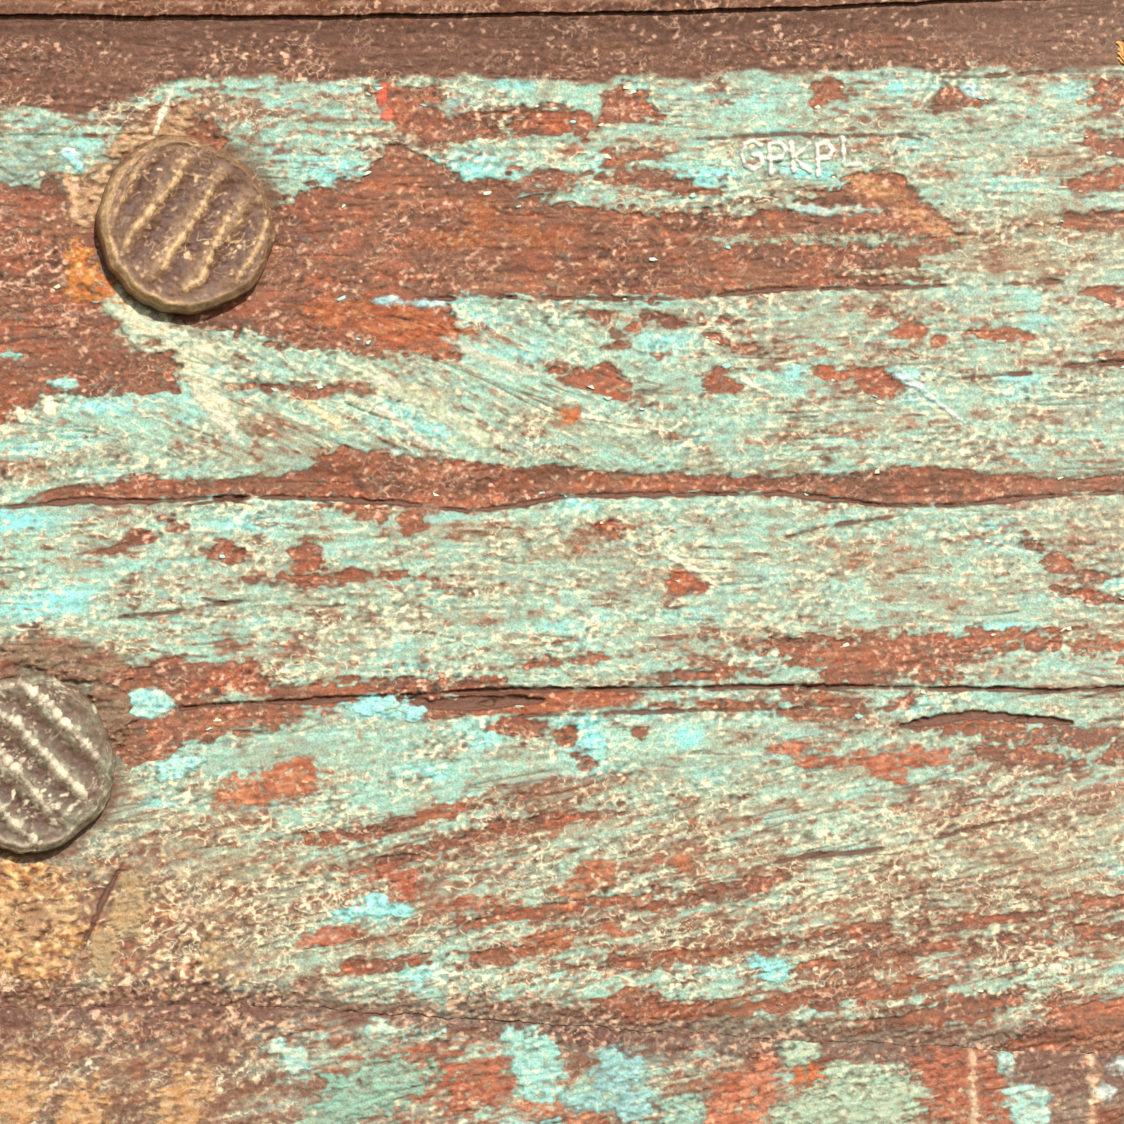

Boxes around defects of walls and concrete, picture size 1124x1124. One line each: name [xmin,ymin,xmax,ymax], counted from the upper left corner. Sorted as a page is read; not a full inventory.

peeling [1055,129,1124,236]
peeling [0,118,189,425]
peeling [172,77,961,410]
peeling [199,536,439,590]
crack [0,491,1124,538]
peeling [26,445,1124,537]
peeling [0,626,1124,782]
crack [179,683,1124,730]
peeling [302,784,630,873]
peeling [584,891,1124,1124]
peeling [262,1017,456,1124]
peeling [499,1025,707,1124]